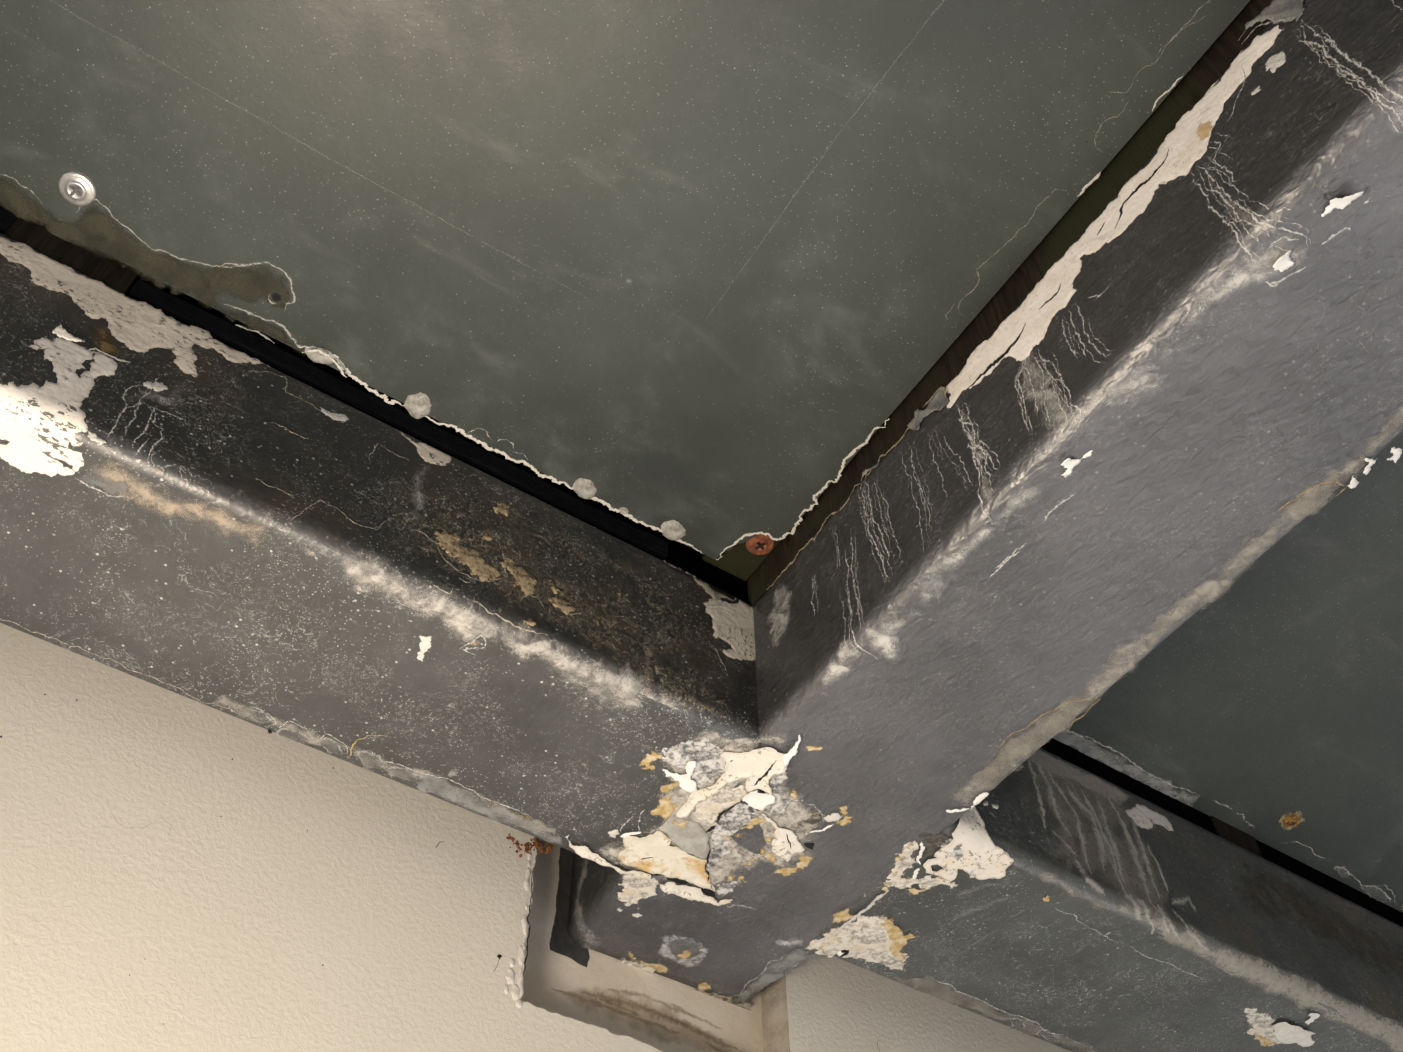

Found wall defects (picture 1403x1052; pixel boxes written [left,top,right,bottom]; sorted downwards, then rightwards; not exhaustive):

peeling [905,0,1305,432]
crack [1097,149,1169,235]
peeling [0,236,270,497]
crack [967,283,1061,390]
peeling [1347,446,1402,489]
peeling [663,560,756,673]
peeling [566,735,843,918]
peeling [913,792,1014,882]
peeling [1244,1007,1320,1047]